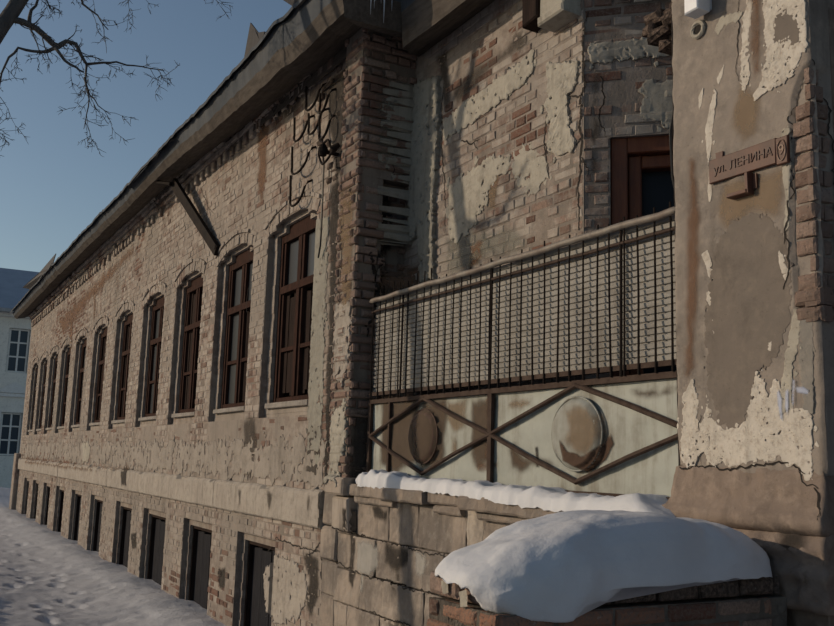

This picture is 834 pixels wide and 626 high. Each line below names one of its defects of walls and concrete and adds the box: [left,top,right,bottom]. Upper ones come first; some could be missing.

flaking render [437,37,673,244]
crack [569,12,605,230]
spalling [715,0,834,322]
crack [783,83,804,289]
leakage [381,399,447,471]
leakage [472,401,487,465]
corrosion [559,408,613,472]
flaking render [677,369,819,481]
crack [679,418,821,520]
flaking render [263,553,308,626]
leakage [304,554,318,614]
leakage [342,509,425,589]